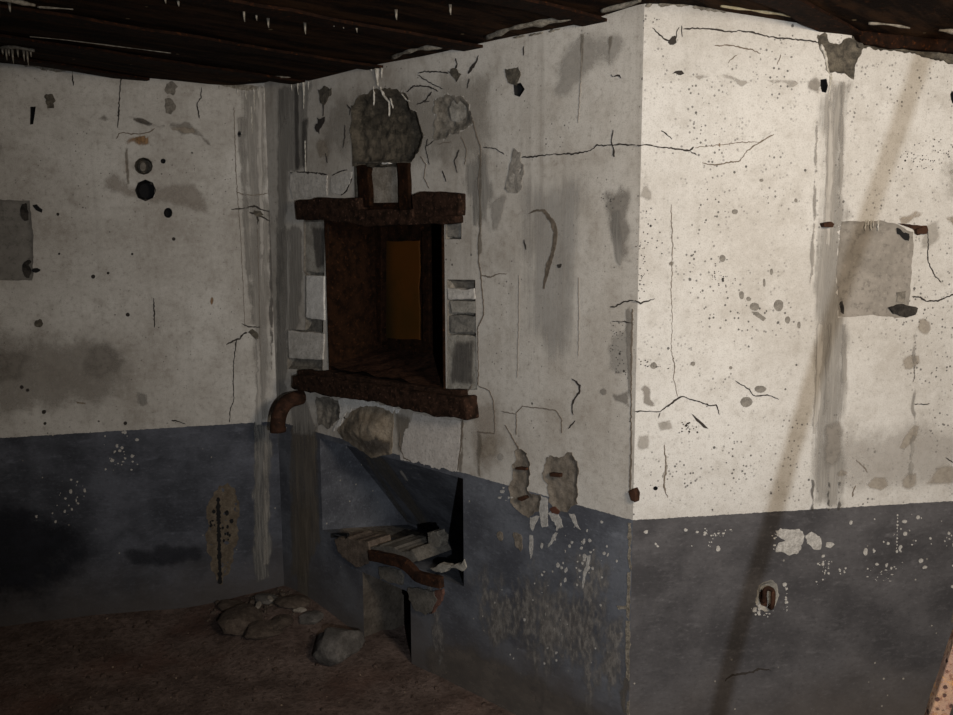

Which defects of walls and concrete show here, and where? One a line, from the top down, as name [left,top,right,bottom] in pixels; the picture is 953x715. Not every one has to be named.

spalling [817,31,953,80]
spalling [350,88,473,168]
peeling [0,199,43,281]
leakage [221,76,352,596]
crack [420,120,779,490]
leakage [809,44,847,511]
peeling [836,220,928,318]
spalling [315,396,401,431]
flaking render [400,413,461,472]
crack [661,445,669,498]
peeling [480,449,632,698]
peeling [771,528,847,585]